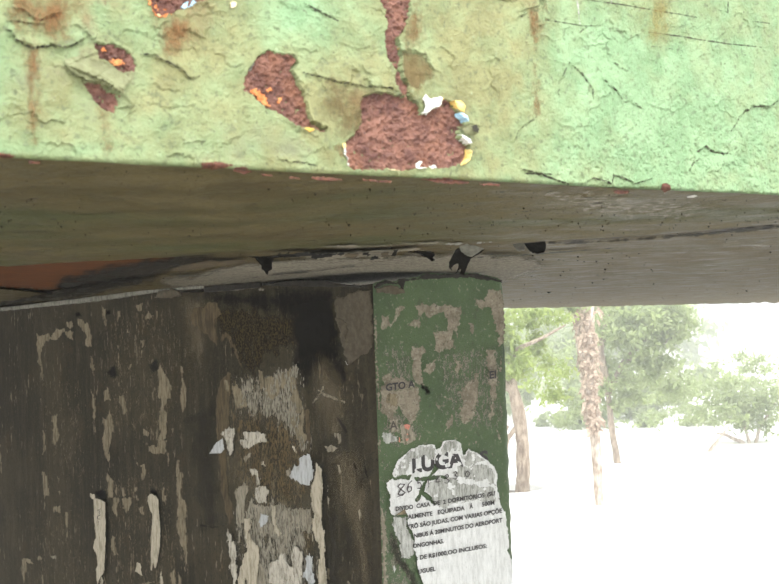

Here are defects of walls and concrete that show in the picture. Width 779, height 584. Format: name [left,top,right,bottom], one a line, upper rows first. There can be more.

peeling [65,54,131,94]
crack [558,62,642,109]
peeling [0,241,546,454]
leakage [218,306,337,377]
peeling [379,499,389,584]